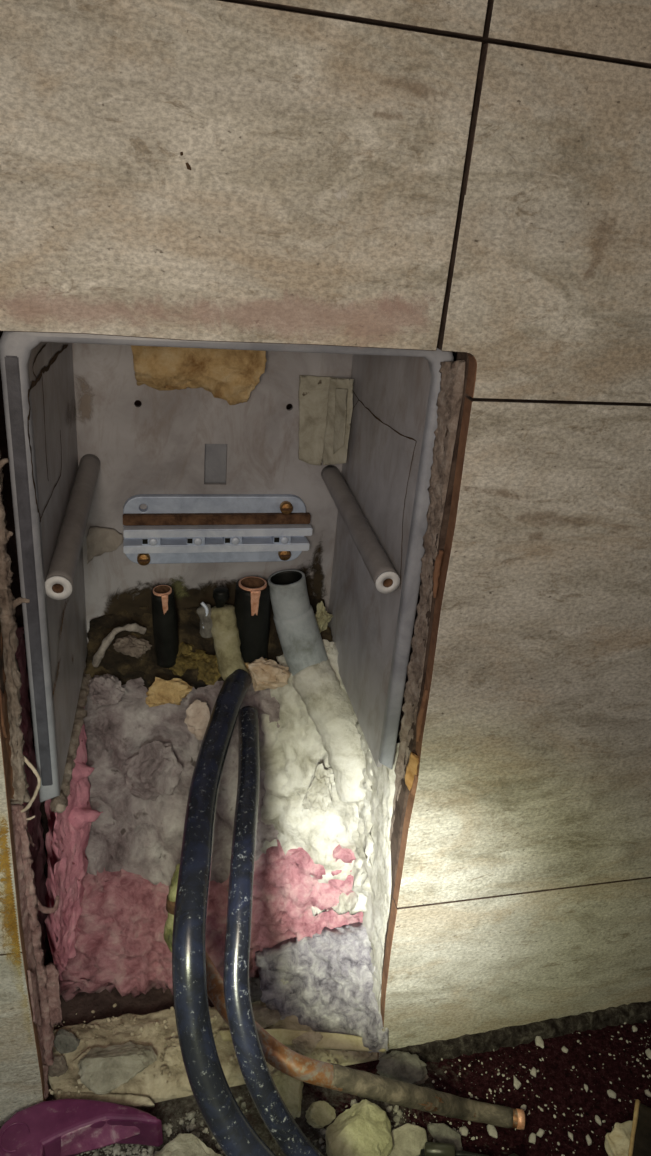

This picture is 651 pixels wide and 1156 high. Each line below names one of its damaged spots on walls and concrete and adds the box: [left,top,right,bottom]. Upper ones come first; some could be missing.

crack [27,343,68,523]
corrosion [0,820,22,965]